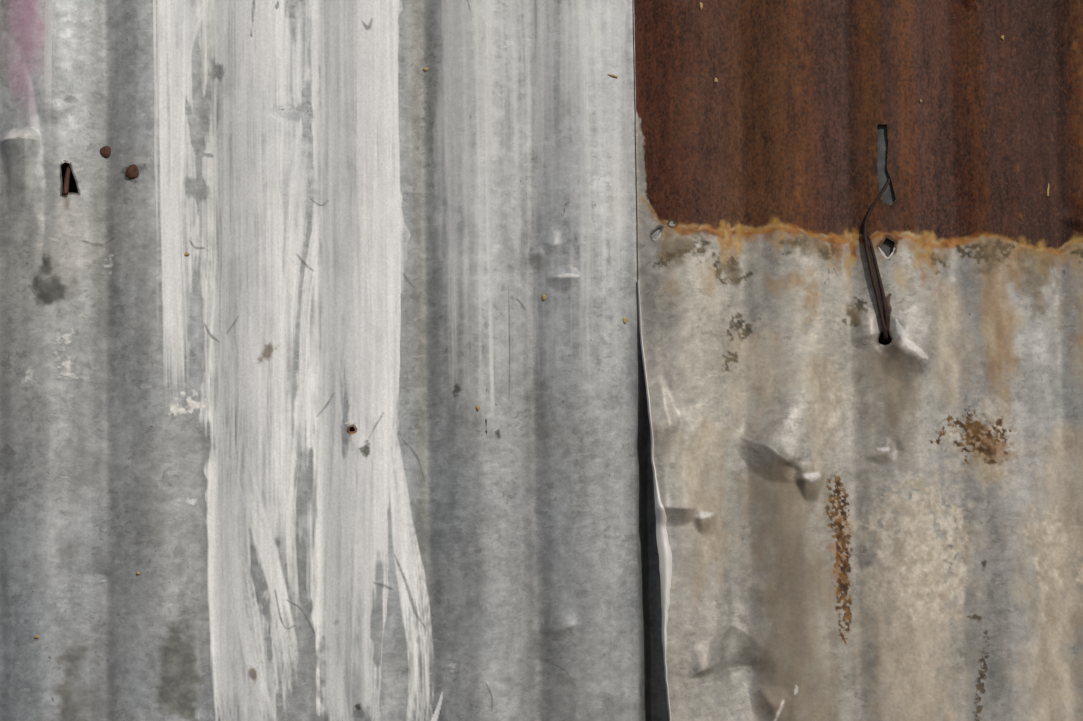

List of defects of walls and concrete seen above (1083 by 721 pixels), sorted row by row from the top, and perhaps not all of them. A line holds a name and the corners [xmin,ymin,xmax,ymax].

water stain [432,0,635,455]
corrosion [634,0,1083,302]
corrosion [823,464,858,651]
water stain [649,221,1083,721]